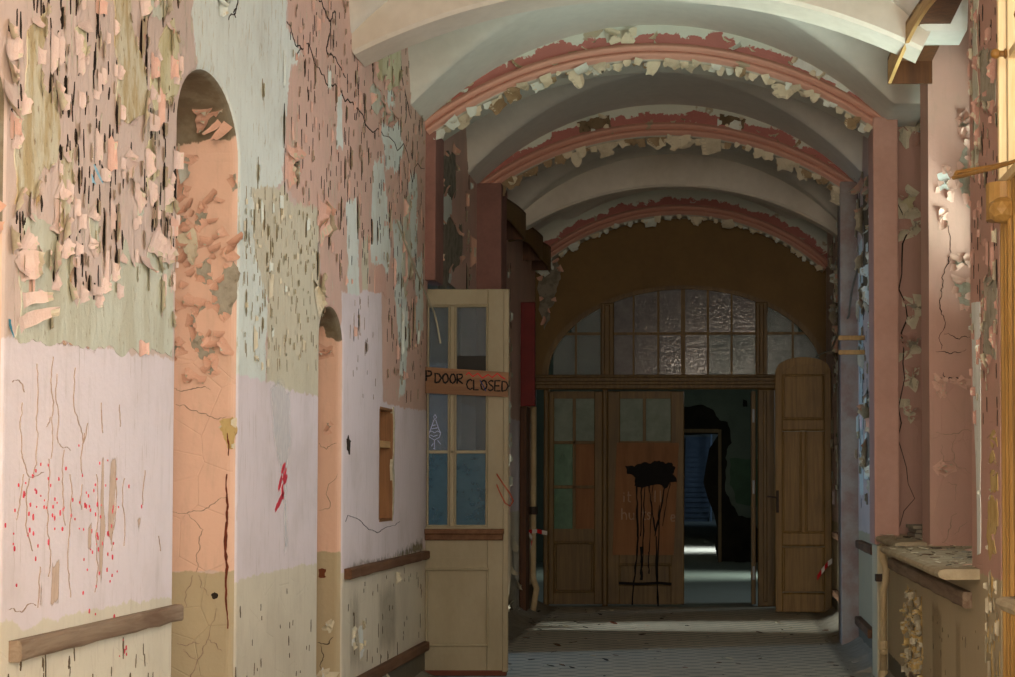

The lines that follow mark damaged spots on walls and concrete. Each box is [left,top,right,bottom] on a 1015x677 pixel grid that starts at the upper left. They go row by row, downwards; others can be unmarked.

crack [286,0,425,182]
peeling [0,0,873,403]
peeling [502,113,870,508]
crack [939,226,968,379]
peeling [935,0,998,426]
crack [9,357,146,613]
crack [175,386,225,419]
peeling [218,417,238,449]
crack [176,495,228,677]
peeling [899,584,941,677]